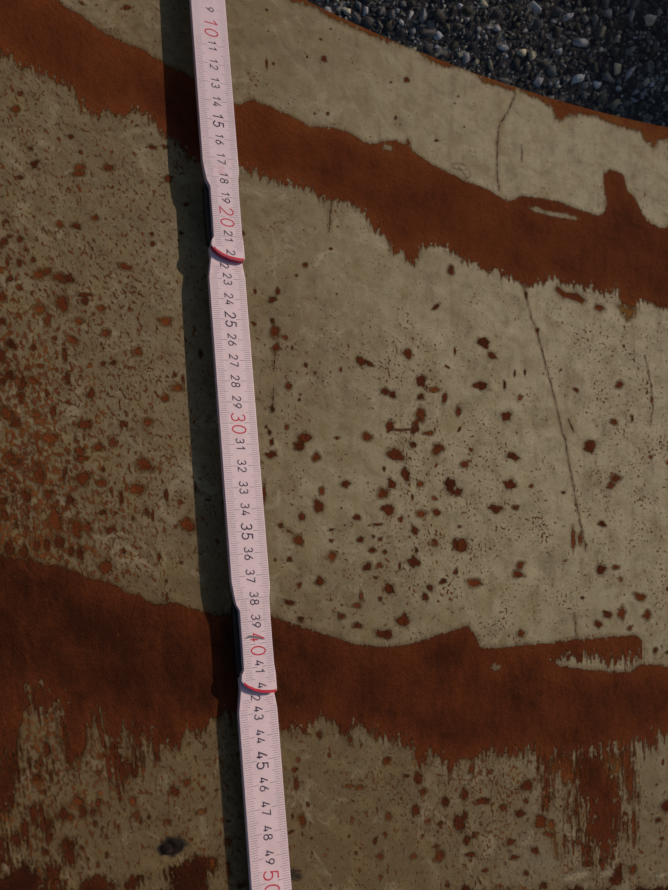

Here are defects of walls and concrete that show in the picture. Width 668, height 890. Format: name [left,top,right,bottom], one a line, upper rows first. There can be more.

corrosion [0,0,248,890]
corrosion [291,0,404,46]
corrosion [233,50,668,890]
crack [497,93,516,188]